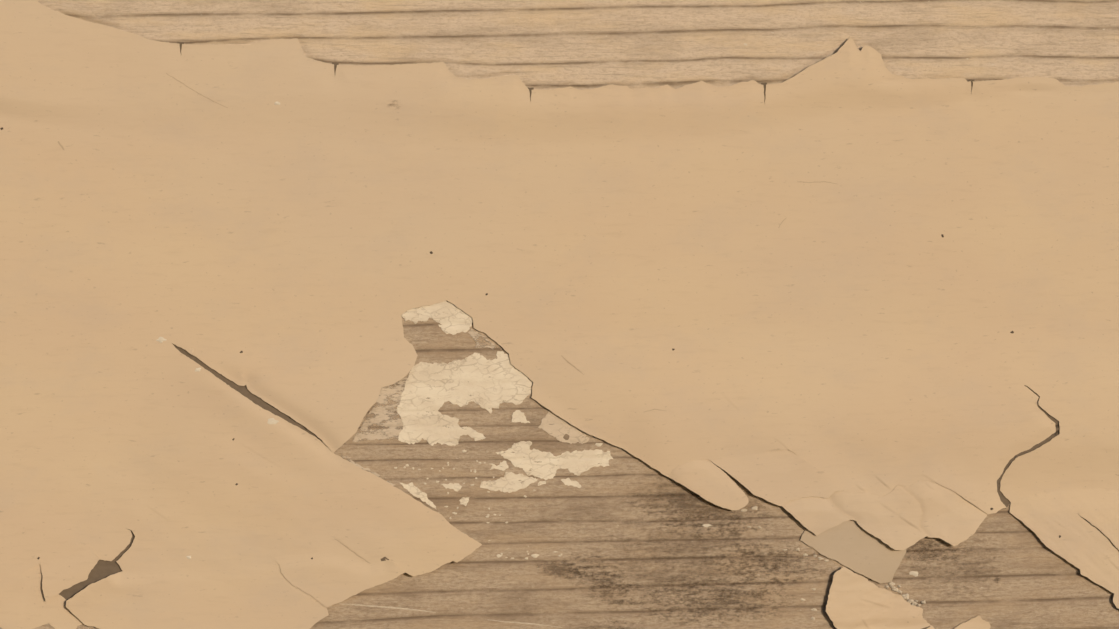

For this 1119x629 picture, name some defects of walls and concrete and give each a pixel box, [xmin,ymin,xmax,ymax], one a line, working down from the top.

peeling [37,0,1119,90]
crack [172,343,320,439]
peeling [0,301,1119,629]
crack [997,385,1059,509]